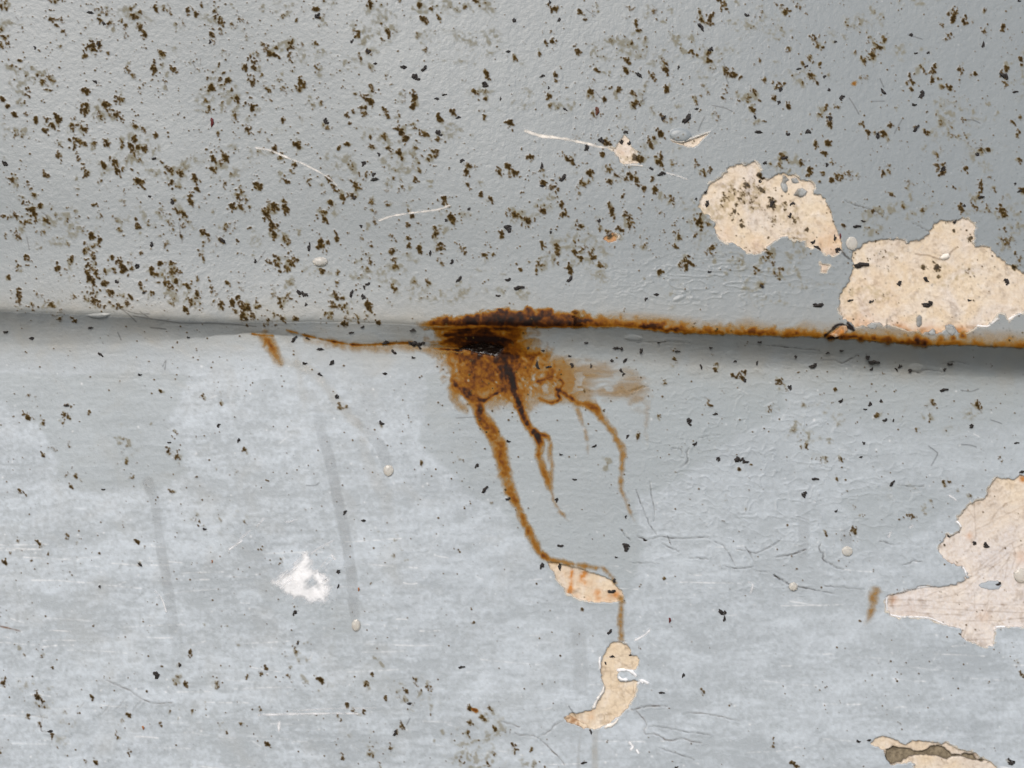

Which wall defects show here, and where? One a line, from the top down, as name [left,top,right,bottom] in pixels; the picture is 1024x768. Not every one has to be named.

peeling [608,135,643,166]
peeling [698,161,1024,337]
corrosion [251,331,281,364]
corrosion [286,305,1024,581]
peeling [884,475,1024,648]
peeling [548,562,624,603]
corrosion [868,588,879,616]
peeling [564,642,649,729]
peeling [870,736,997,768]